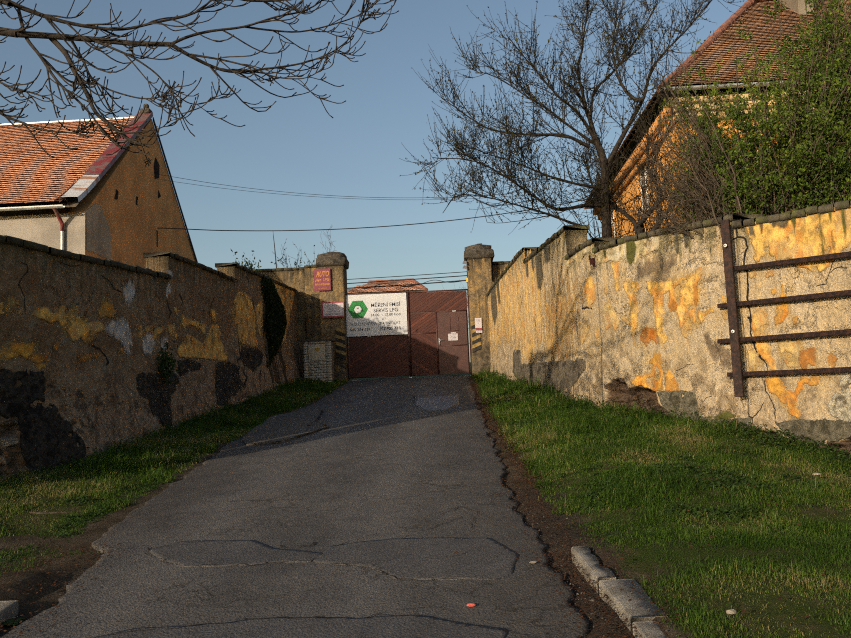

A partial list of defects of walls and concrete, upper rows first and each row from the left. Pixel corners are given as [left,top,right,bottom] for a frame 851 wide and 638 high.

peeling [746,205,851,278]
peeling [137,307,227,361]
peeling [231,291,268,349]
peeling [274,279,295,345]
peeling [566,236,728,417]
crack [733,219,776,422]
peeling [747,284,819,419]
crack [368,570,543,638]